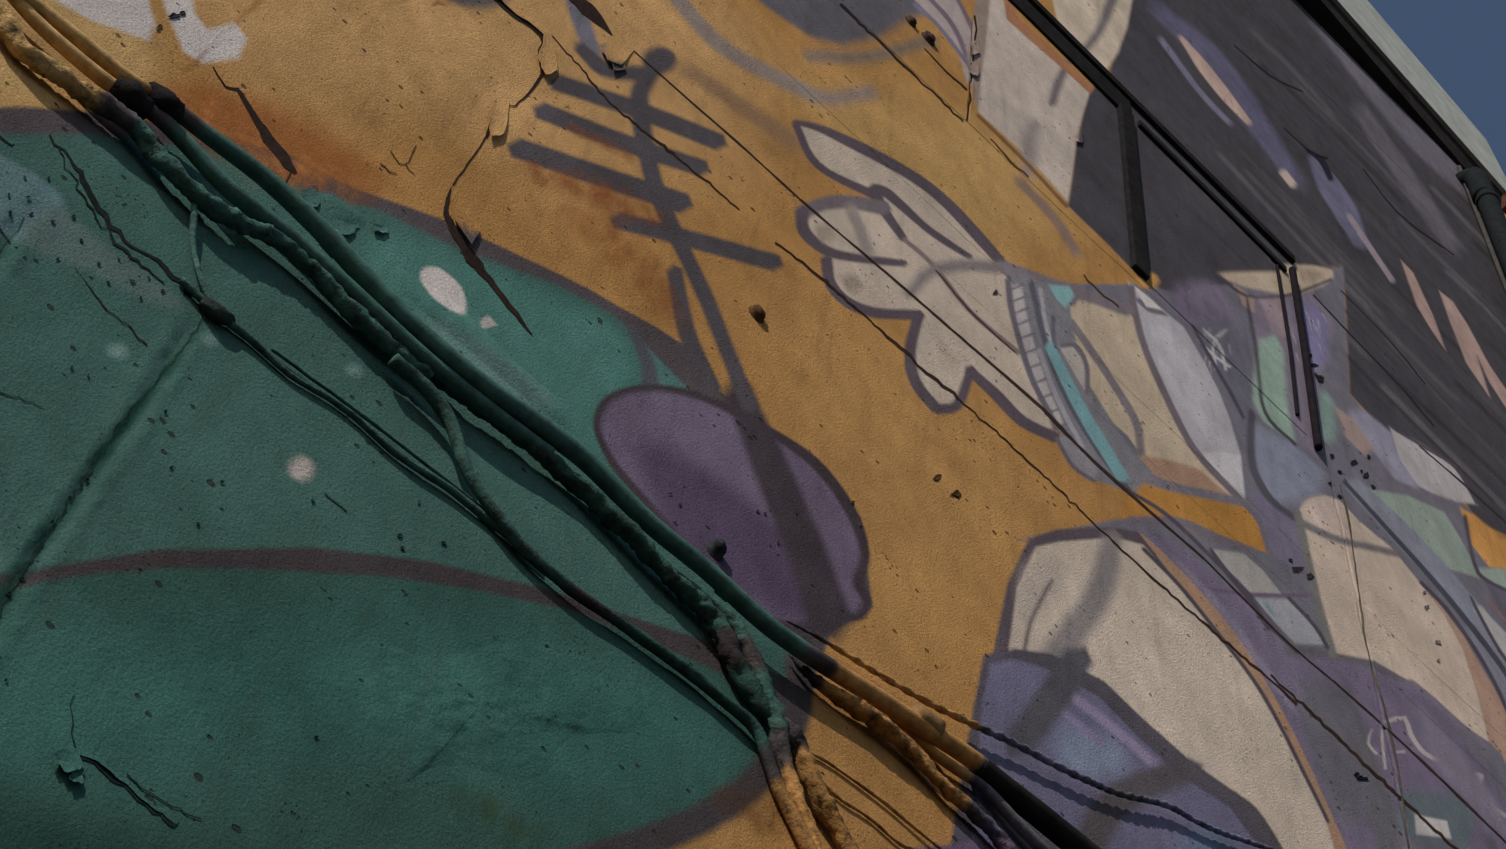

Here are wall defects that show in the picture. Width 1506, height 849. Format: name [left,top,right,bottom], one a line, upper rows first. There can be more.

peeling [600,36,634,70]
peeling [302,186,388,235]
crack [380,146,416,174]
crack [443,0,740,335]
crack [0,133,207,616]
crack [570,0,1506,849]
crack [52,694,202,827]